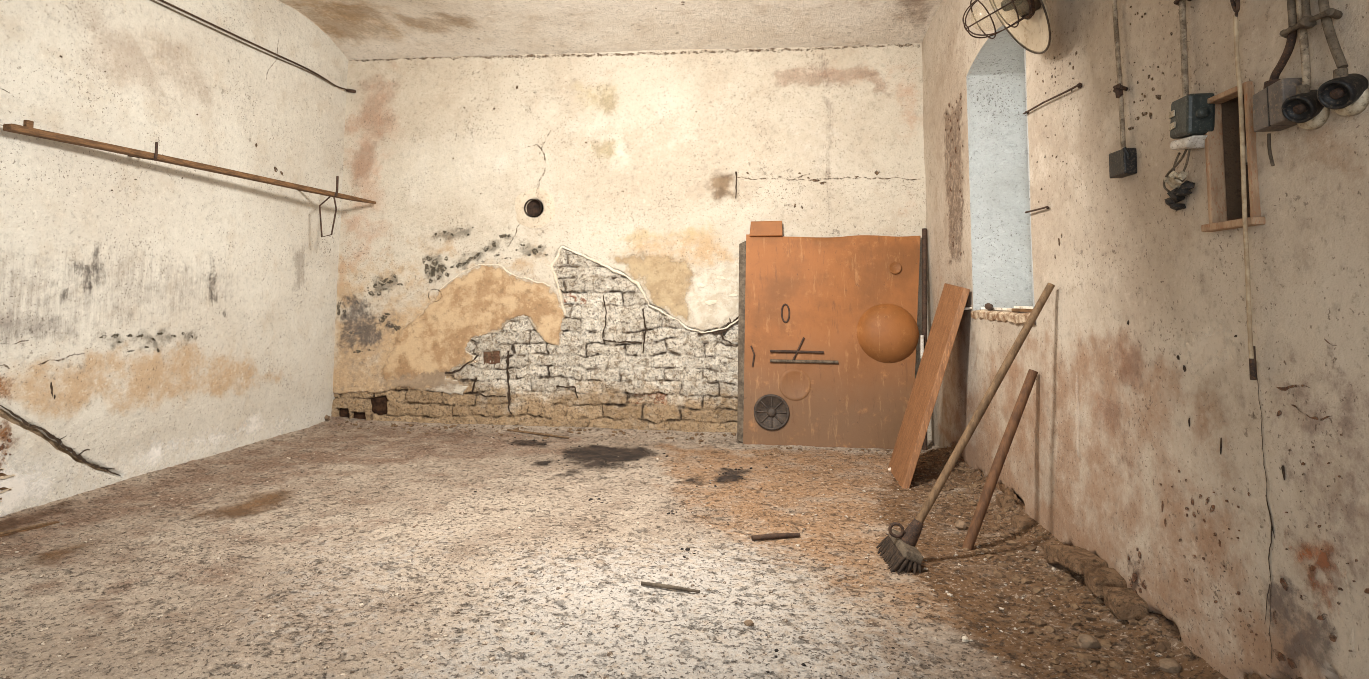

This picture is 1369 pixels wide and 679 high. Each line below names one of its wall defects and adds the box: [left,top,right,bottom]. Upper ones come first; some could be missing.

water stain [99,332,193,352]
water stain [337,274,403,353]
spalling [331,246,738,433]
crack [0,405,121,476]
crack [1256,361,1275,659]
rust [1297,544,1335,603]
water stain [1268,578,1337,679]